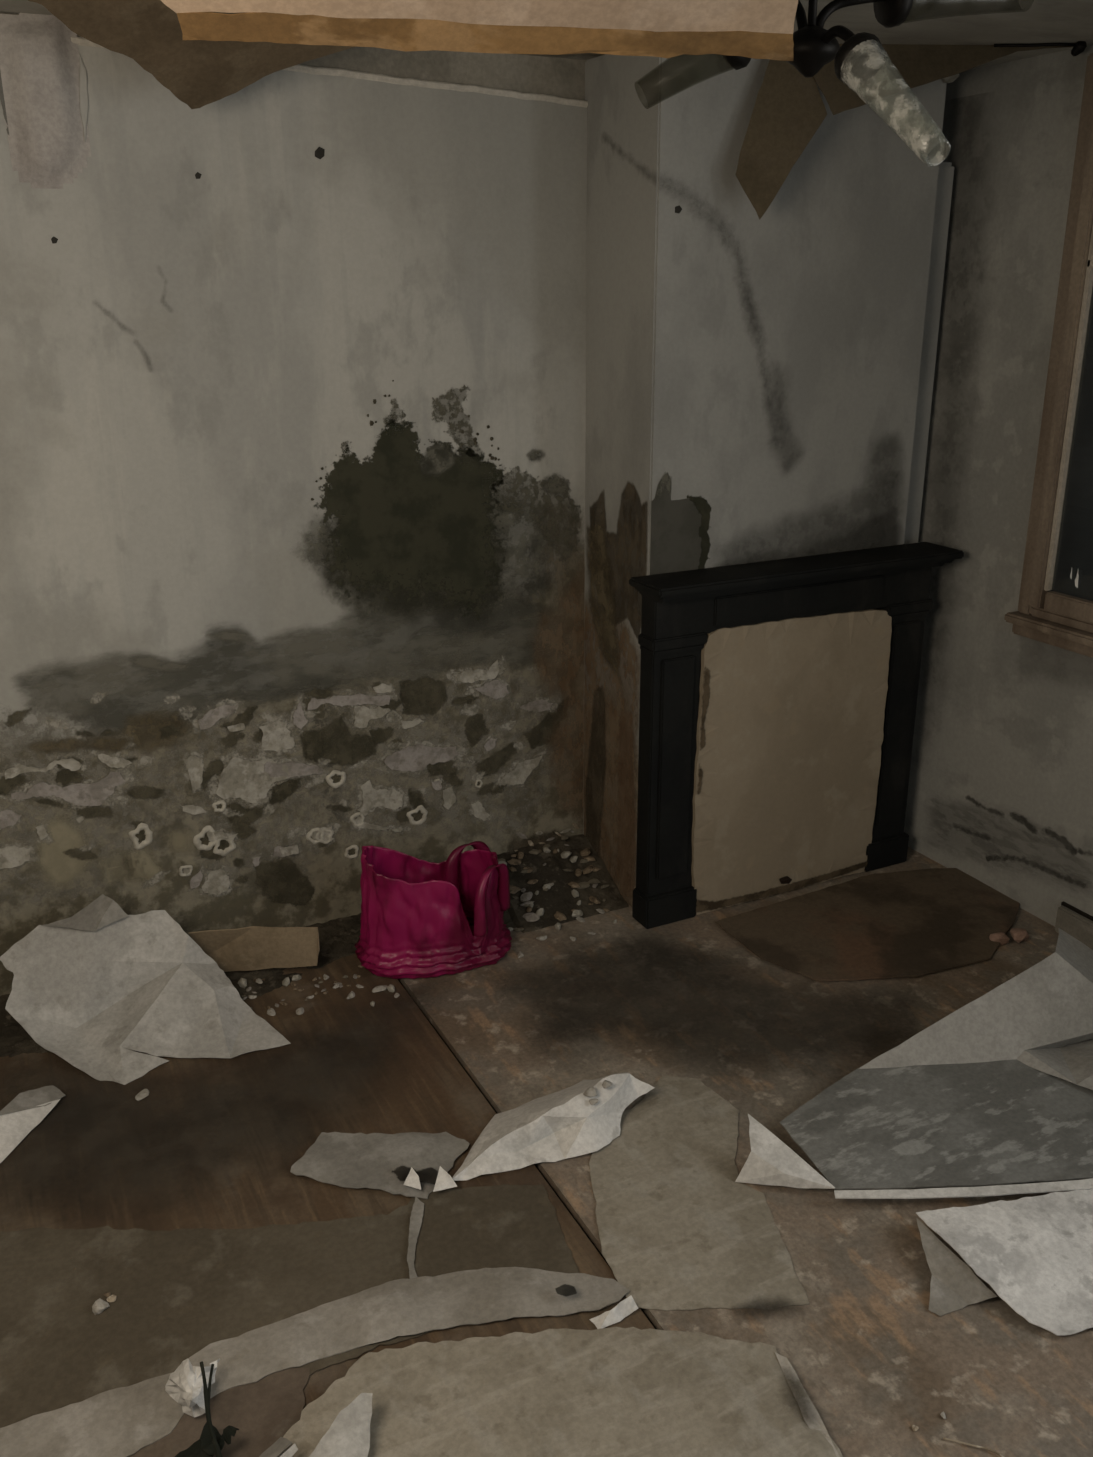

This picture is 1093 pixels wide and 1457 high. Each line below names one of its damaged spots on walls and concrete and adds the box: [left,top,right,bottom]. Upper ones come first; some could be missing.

peeling [0,656,579,906]
leakage [0,380,647,996]
crack [954,797,1092,888]